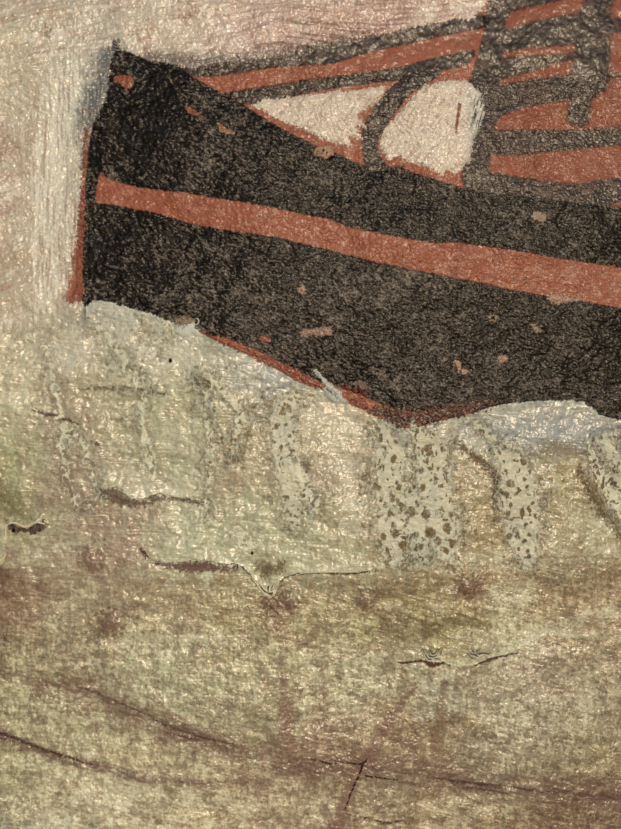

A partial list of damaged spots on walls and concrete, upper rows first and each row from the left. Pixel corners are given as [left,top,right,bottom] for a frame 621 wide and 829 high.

peeling [35,314,552,576]
crack [397,660,451,668]
crack [475,653,518,666]
crack [311,758,398,810]